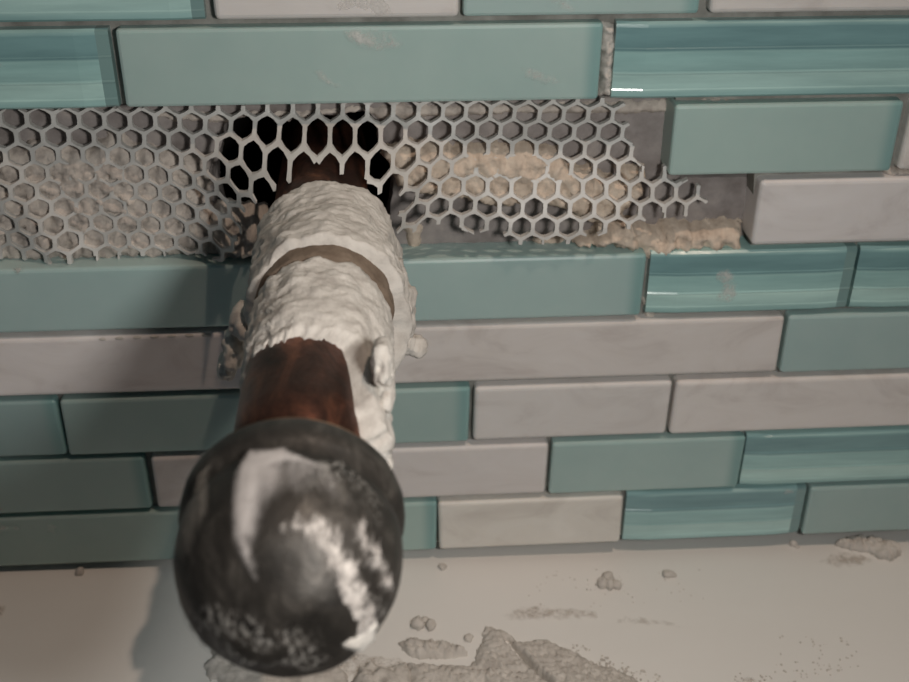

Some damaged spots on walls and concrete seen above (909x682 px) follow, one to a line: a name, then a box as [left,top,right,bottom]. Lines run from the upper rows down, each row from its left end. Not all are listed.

peeling [0,94,747,244]